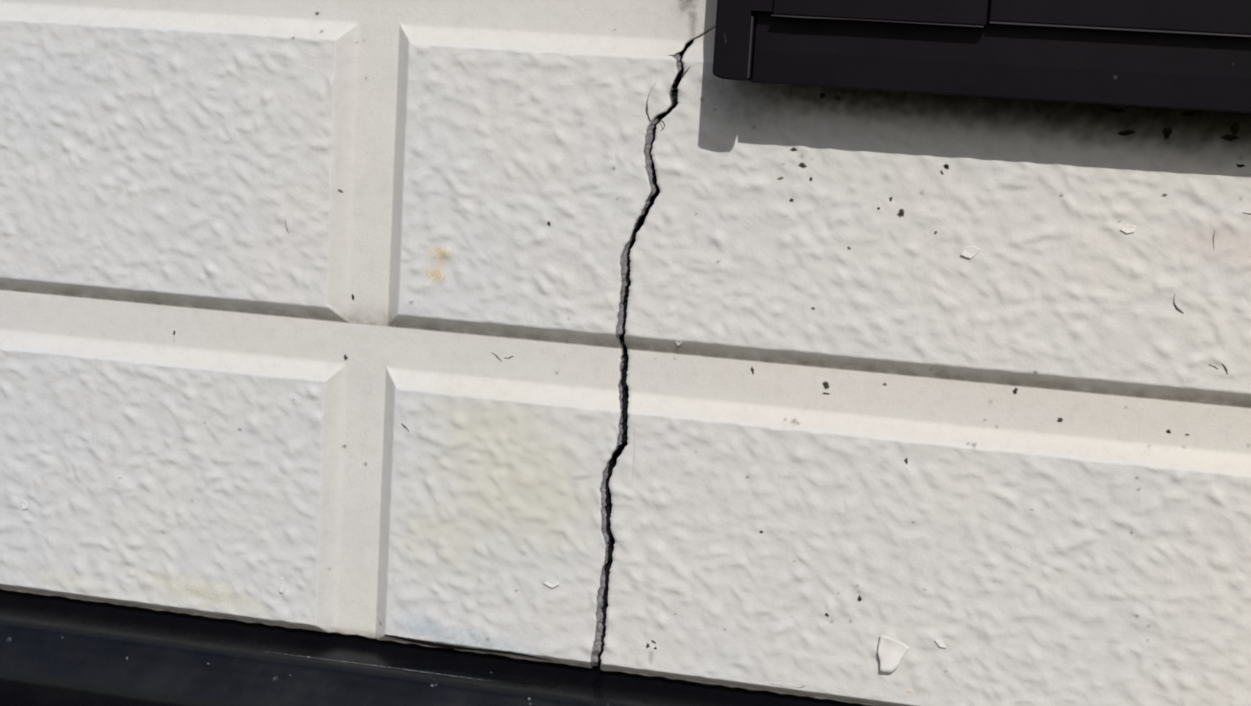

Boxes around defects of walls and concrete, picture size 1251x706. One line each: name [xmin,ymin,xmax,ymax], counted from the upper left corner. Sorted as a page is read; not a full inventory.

crack [590,33,705,666]
peeling [878,635,910,673]